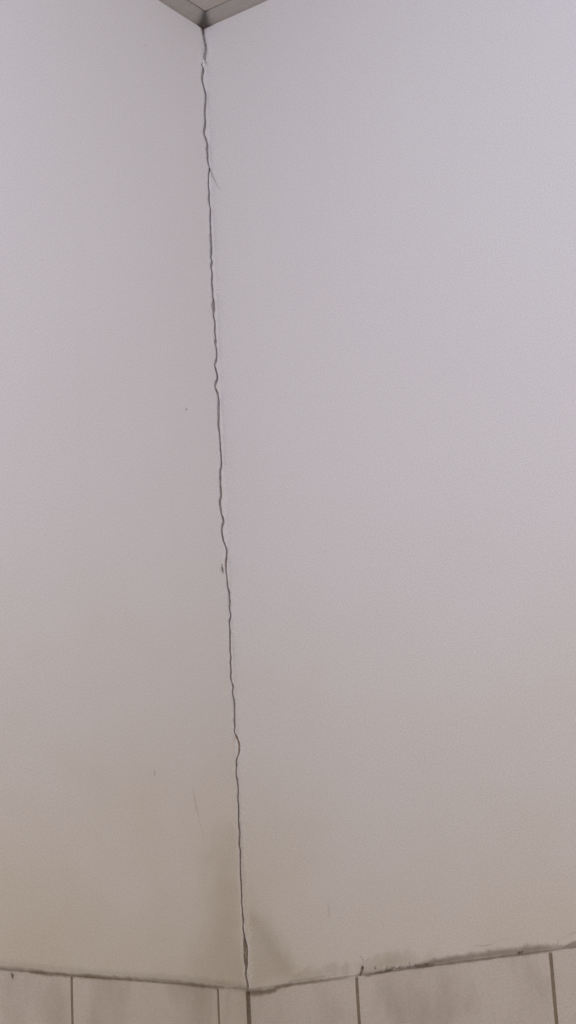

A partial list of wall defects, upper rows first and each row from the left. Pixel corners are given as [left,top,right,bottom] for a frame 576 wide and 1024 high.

crack [201,28,249,989]